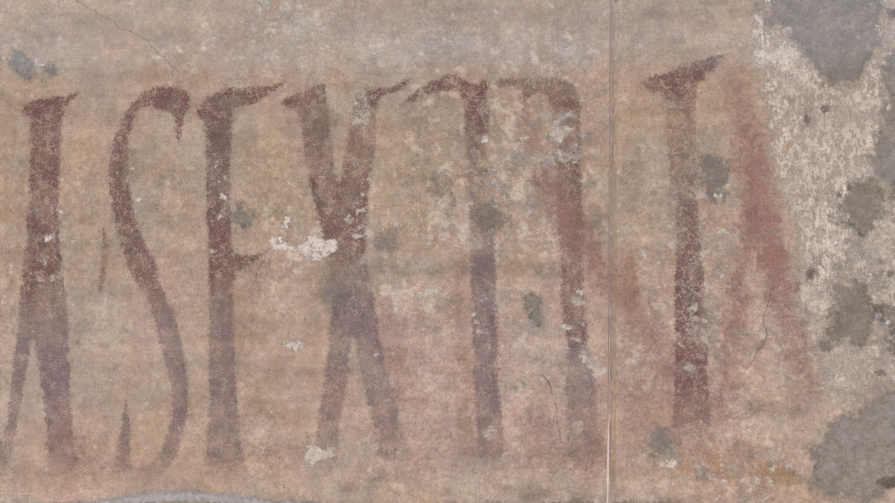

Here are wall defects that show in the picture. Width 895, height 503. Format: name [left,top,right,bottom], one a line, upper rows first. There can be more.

peeling [746,0,895,354]
flaking render [269,215,338,261]
flaking render [809,386,895,503]